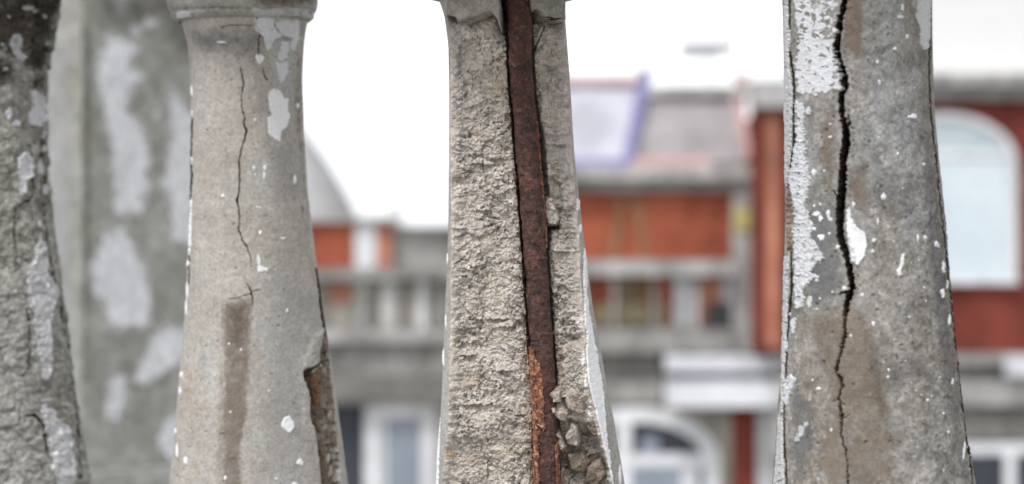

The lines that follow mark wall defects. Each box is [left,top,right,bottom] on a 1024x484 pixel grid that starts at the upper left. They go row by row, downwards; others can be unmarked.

peeling [5,42,70,380]
peeling [40,405,78,484]
water stain [223,303,251,484]
crack [221,17,268,306]
peeling [252,7,314,142]
spalling [303,332,340,484]
spalling [436,0,533,484]
corrosion [498,0,534,482]
spalling [532,10,622,484]
peeling [773,0,894,484]
crack [832,0,856,484]
peeling [898,0,932,50]